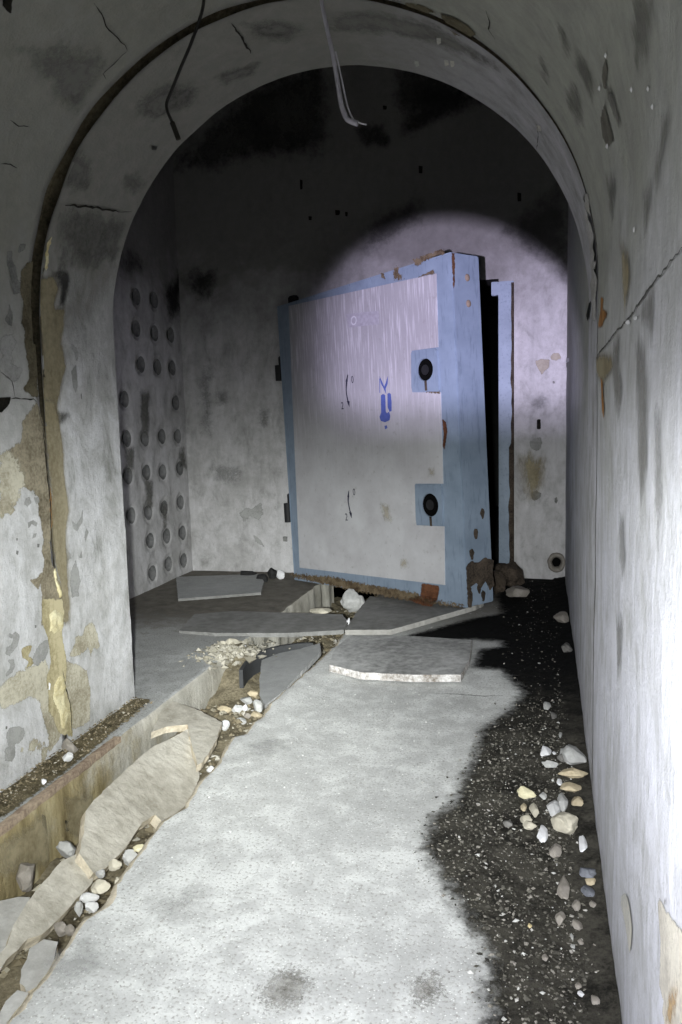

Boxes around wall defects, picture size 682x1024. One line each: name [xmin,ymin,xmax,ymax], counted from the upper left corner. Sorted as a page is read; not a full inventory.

crack [95,5,127,79]
crack [231,23,251,53]
spalling [405,3,476,45]
crack [65,204,127,212]
rust [413,249,455,288]
crack [596,247,682,358]
spalling [0,397,36,413]
crack [38,409,52,563]
peeling [0,632,61,762]
peeling [66,622,100,729]
spalling [658,899,682,1024]